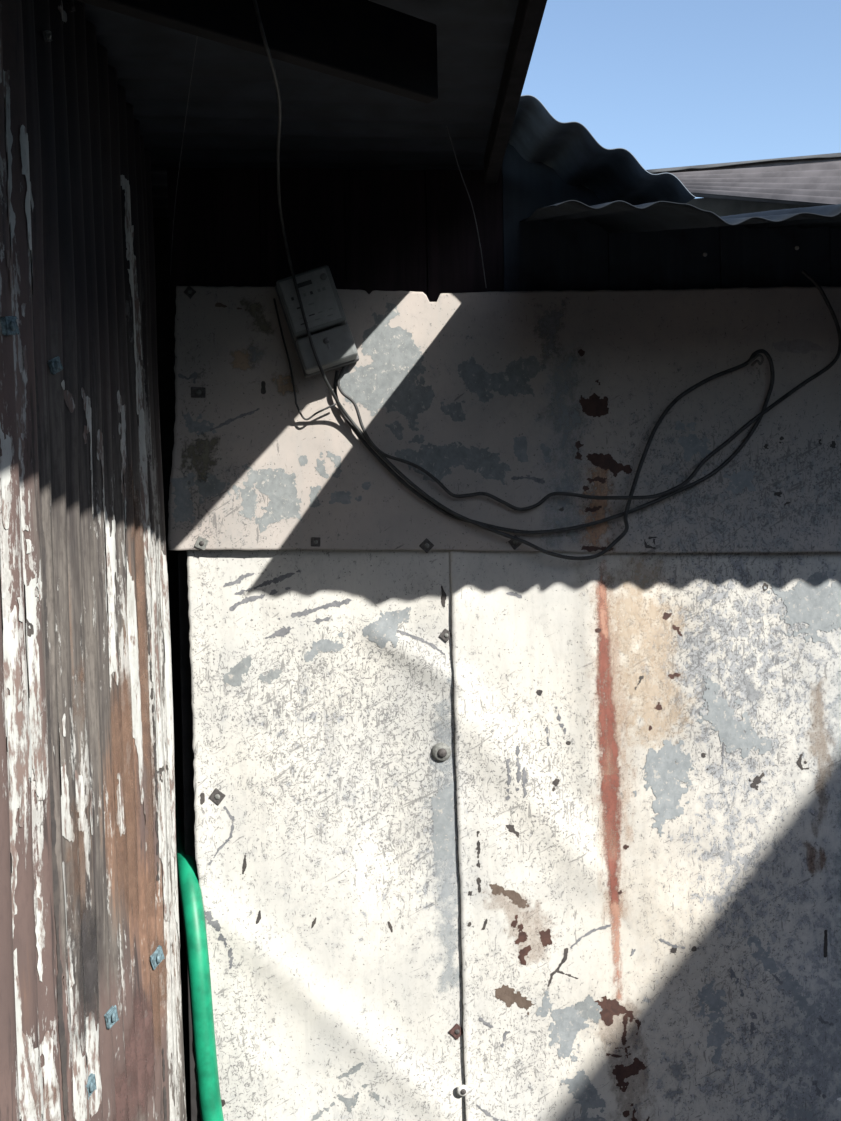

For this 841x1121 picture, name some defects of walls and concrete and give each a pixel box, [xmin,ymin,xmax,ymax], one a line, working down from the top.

peeling [0,39,34,317]
peeling [0,333,32,553]
peeling [61,175,180,949]
corrosion [579,380,609,417]
corrosion [575,441,632,552]
peeling [0,551,102,1121]
corrosion [495,985,535,1015]
corrosion [489,883,552,965]
corrosion [595,567,650,1121]